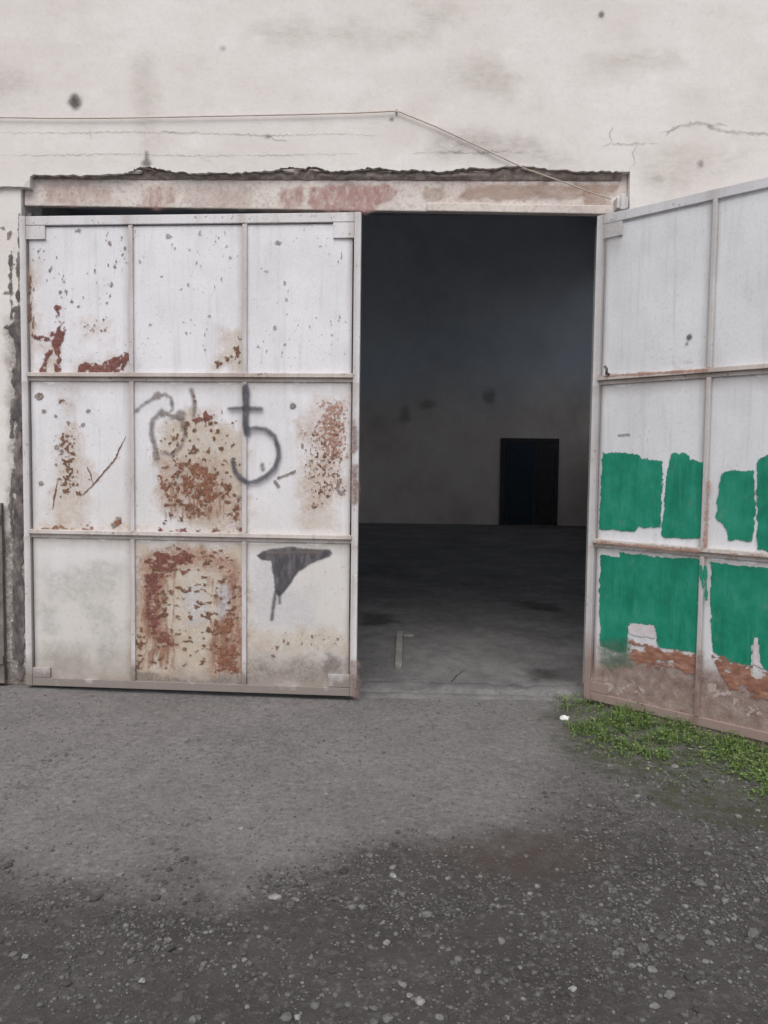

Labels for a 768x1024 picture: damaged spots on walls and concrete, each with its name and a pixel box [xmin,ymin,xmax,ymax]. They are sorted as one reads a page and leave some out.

spalling [1,213,25,685]